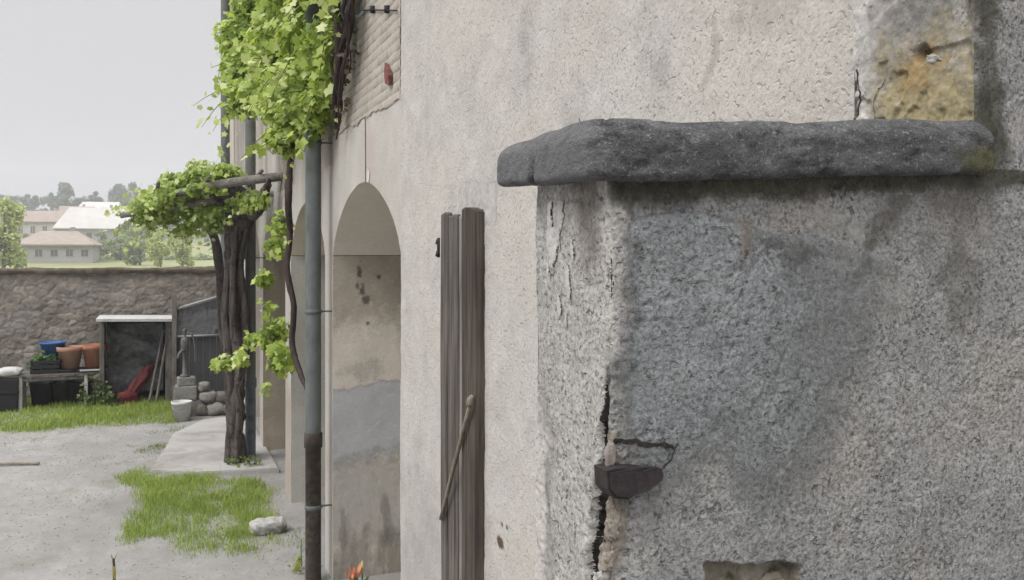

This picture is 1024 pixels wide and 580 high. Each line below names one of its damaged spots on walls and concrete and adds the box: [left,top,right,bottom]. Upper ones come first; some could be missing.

crack [853,69,885,120]
leakage [333,256,401,324]
crack [599,370,678,470]
leakage [333,462,401,543]
crack [591,492,609,580]
peeling [759,570,785,580]